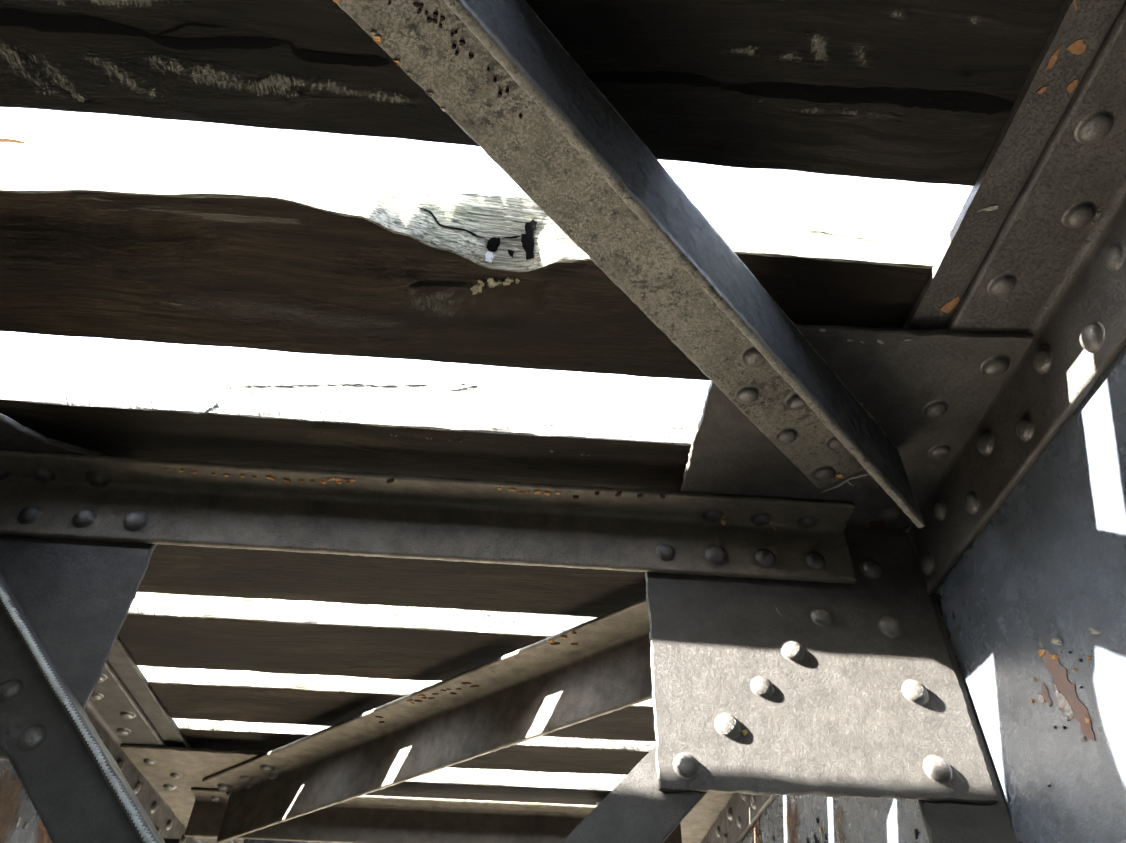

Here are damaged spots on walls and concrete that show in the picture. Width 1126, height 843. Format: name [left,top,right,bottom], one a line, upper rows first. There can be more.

peeling [1066,39,1086,55]
peeling [1029,638,1096,742]
rust [0,773,23,843]
rust [750,820,761,843]
rust [786,803,798,843]